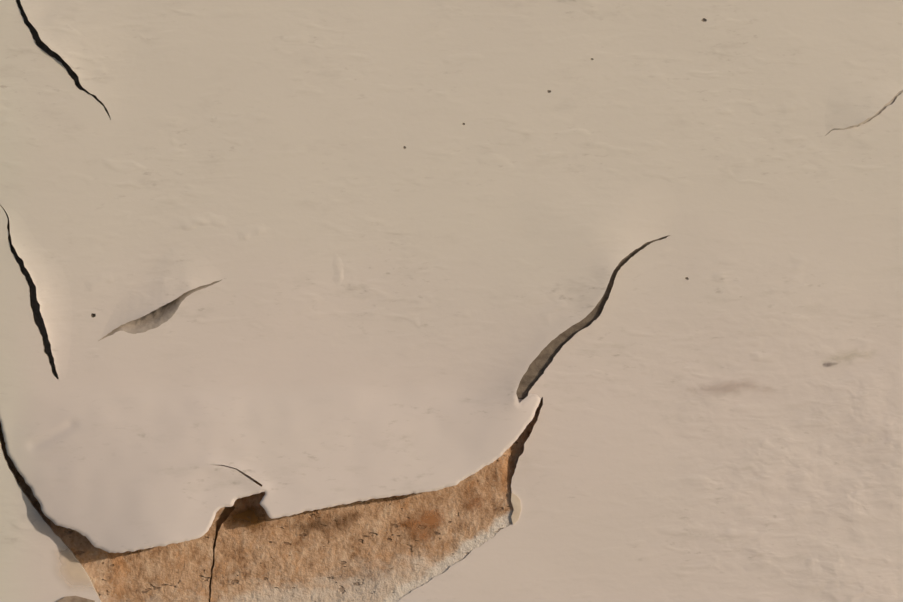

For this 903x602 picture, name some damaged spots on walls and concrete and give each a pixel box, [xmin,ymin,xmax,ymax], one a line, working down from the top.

crack [16,0,141,120]
crack [0,205,73,382]
peeling [0,154,679,602]
crack [516,235,671,399]